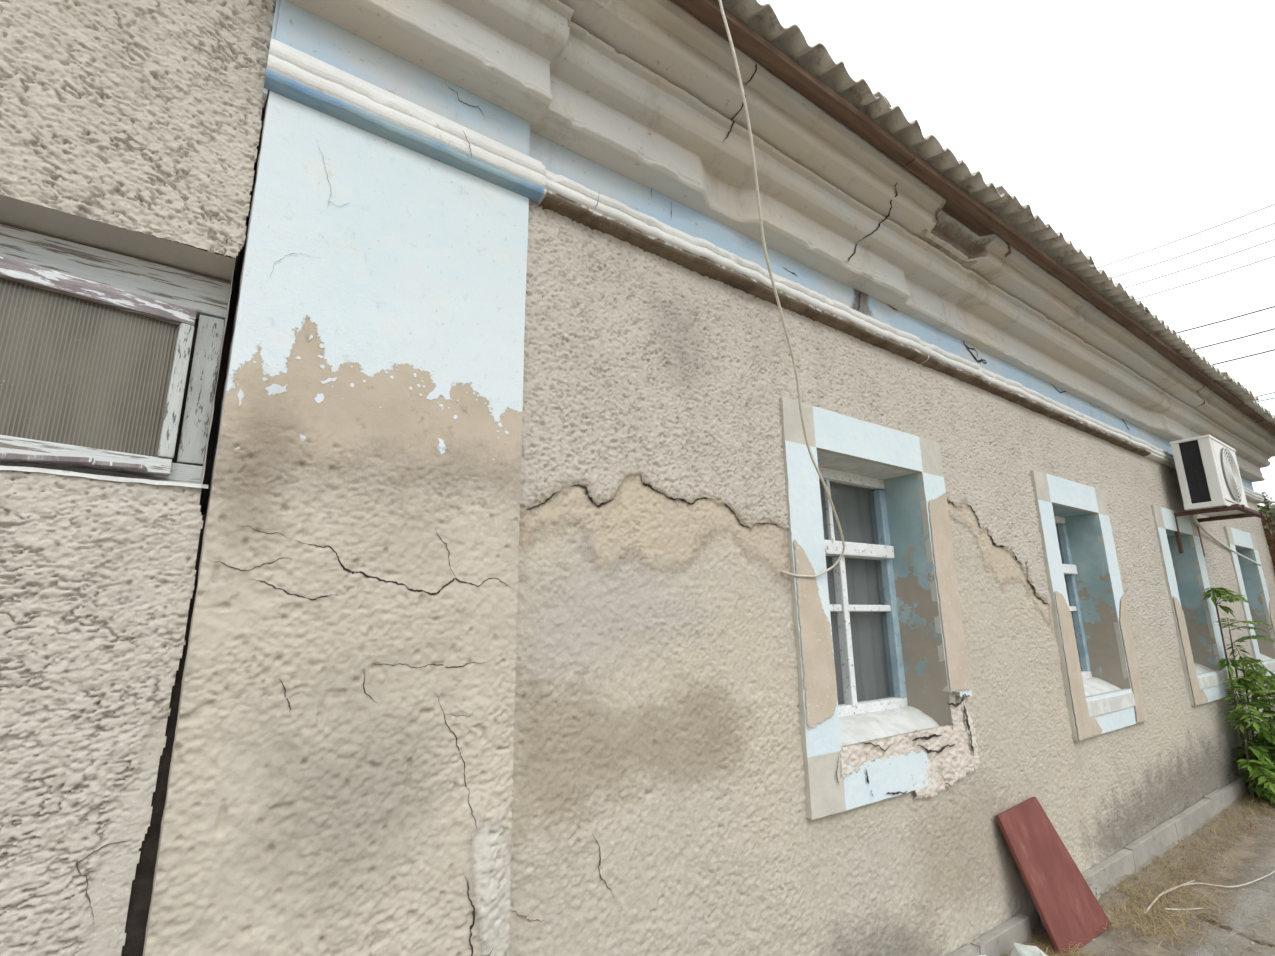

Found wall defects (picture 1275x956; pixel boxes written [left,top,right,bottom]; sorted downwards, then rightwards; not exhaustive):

crack [722,63,757,143]
crack [848,182,898,261]
peeling [145,315,838,956]
spalling [840,493,1102,798]
crack [1198,917,1275,948]